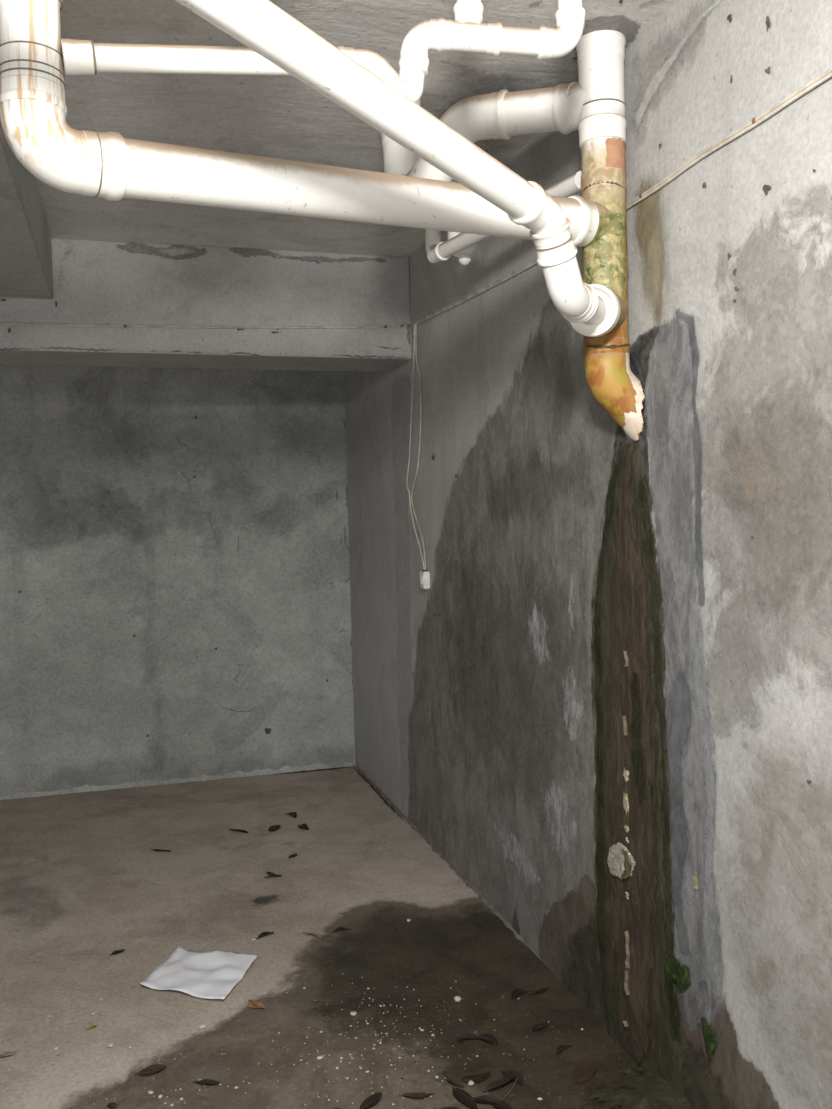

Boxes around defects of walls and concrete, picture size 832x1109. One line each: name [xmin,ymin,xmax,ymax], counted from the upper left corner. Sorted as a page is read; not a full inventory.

leakage [67,216,832,1109]